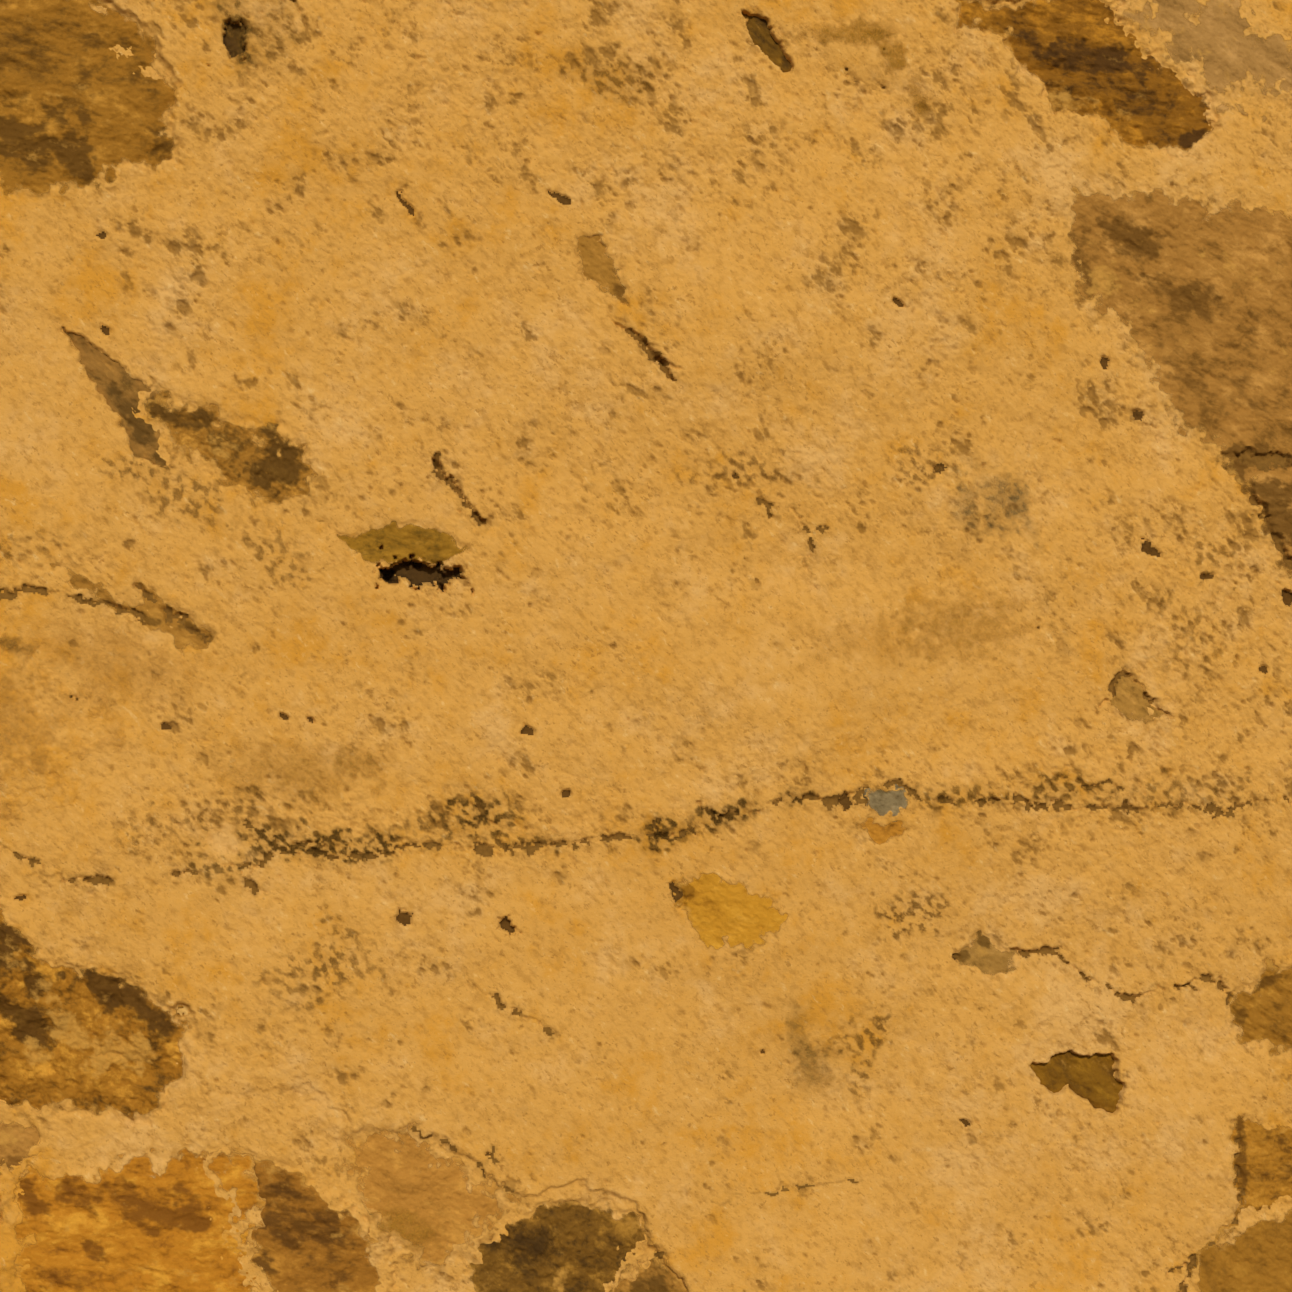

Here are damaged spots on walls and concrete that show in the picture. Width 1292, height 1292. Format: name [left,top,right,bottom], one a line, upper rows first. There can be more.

spalling [0,0,192,209]
spalling [941,0,1292,166]
spalling [1049,174,1292,606]
spalling [48,311,480,592]
crack [238,818,442,895]
crack [470,792,739,857]
crack [772,778,1252,819]
crack [1018,946,1141,1003]
crack [1174,974,1234,1005]
spalling [0,895,712,1292]
spalling [1030,1051,1123,1113]
crack [411,1126,514,1193]